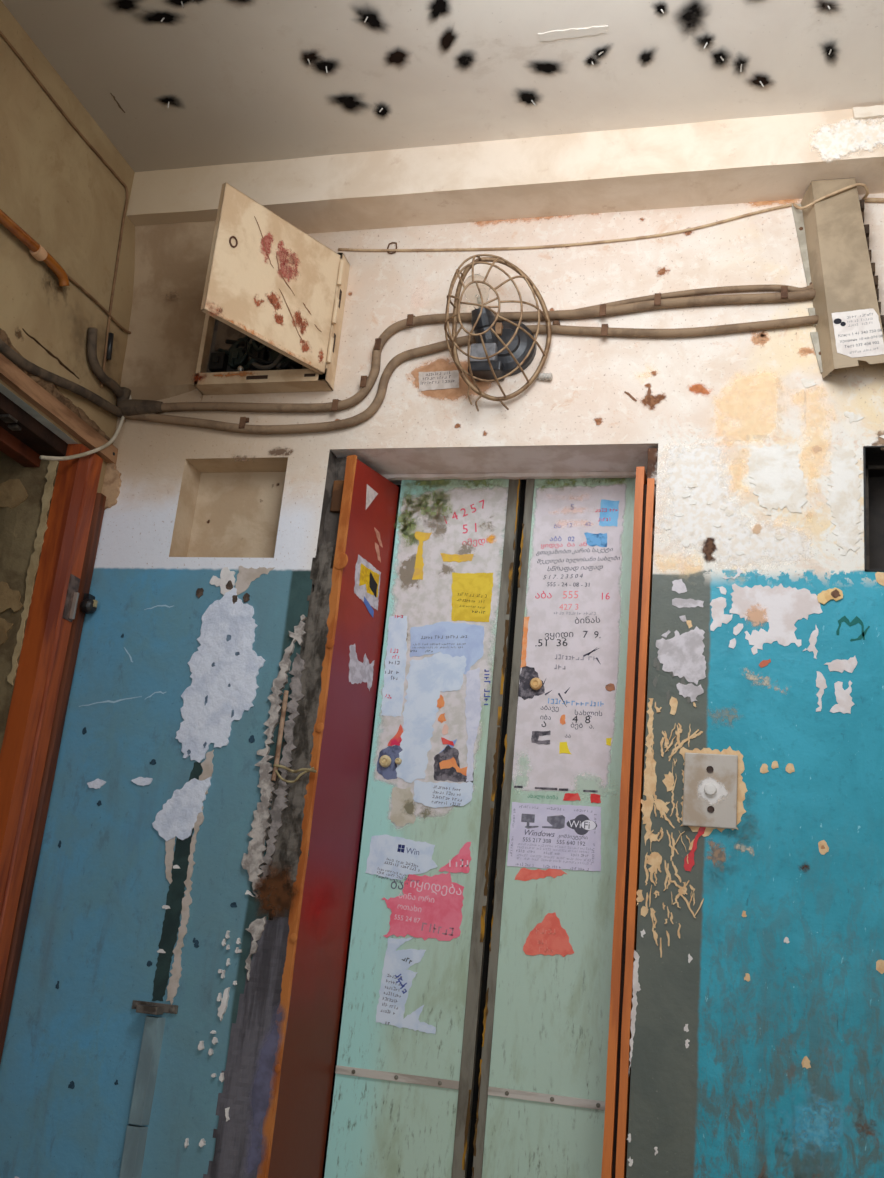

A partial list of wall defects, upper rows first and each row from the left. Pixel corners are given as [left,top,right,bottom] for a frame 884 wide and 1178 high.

peeling [811,117,884,161]
crack [22,328,79,379]
rust [624,371,666,410]
peeling [196,566,275,604]
spalling [230,542,333,908]
peeling [645,698,654,762]
peeling [669,697,678,715]
spalling [760,761,795,773]
spalling [641,746,748,873]
spalling [184,916,291,1178]